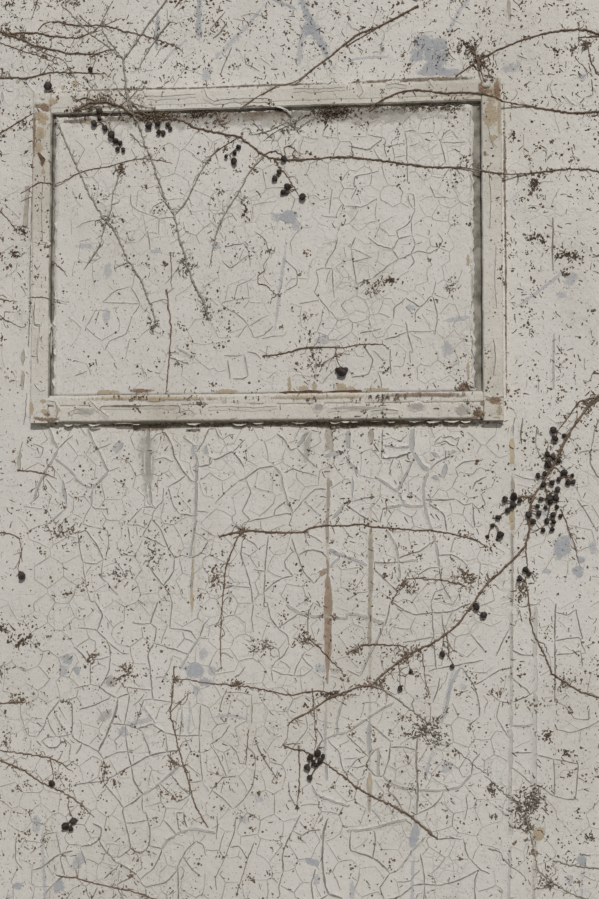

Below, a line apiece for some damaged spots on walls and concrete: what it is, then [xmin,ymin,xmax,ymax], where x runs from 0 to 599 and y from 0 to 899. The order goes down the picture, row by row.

crack [0,0,102,77]
crack [170,11,272,90]
crack [0,152,51,363]
crack [68,110,469,390]
crack [520,67,599,270]
crack [0,343,599,899]